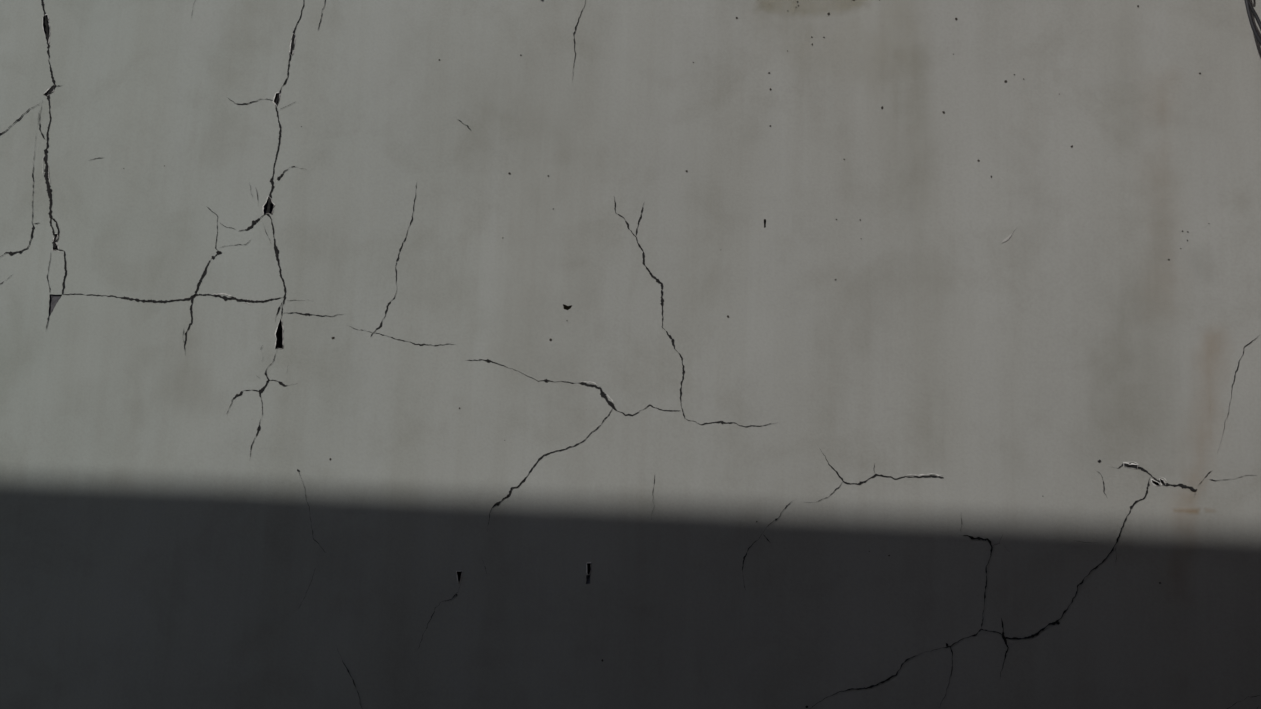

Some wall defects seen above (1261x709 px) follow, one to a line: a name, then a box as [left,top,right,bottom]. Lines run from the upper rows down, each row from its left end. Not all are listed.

crack [0,0,775,531]
crack [1222,338,1256,436]
crack [742,449,944,590]
crack [805,459,1246,709]